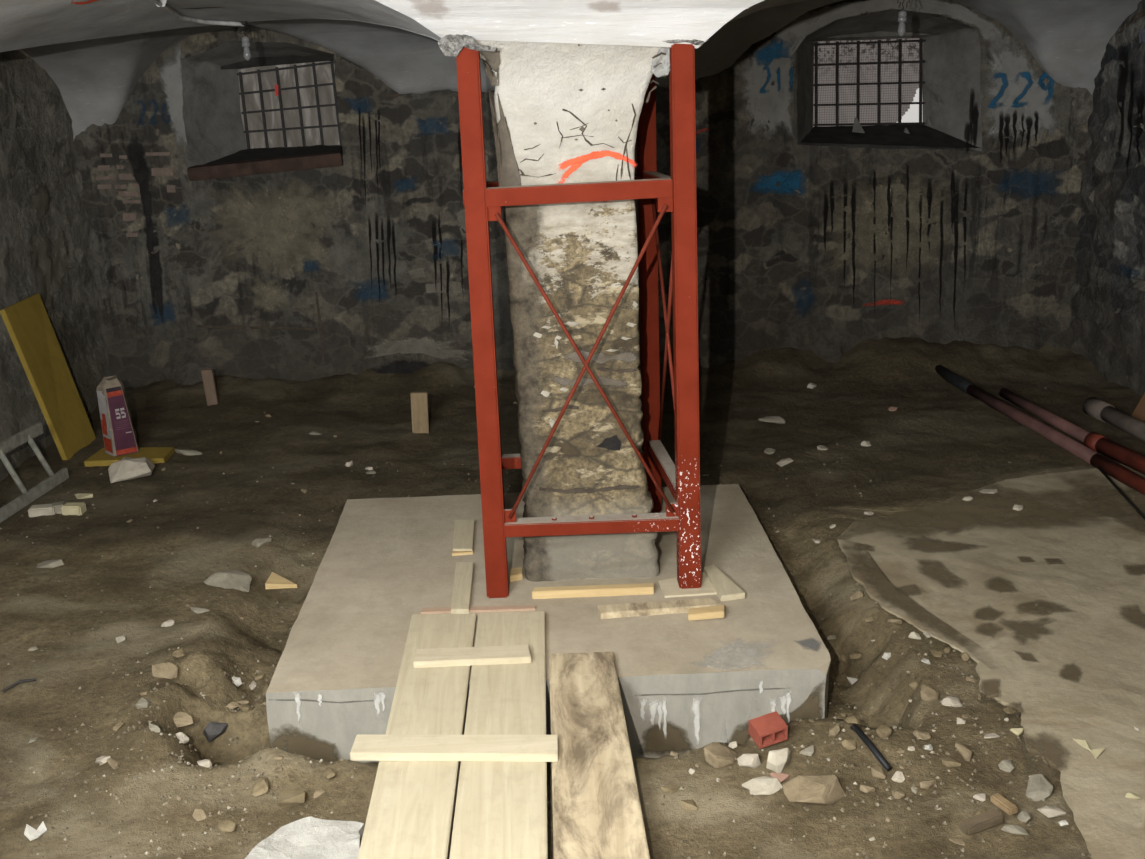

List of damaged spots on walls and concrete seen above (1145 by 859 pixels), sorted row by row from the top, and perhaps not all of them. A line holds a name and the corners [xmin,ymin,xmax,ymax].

flaking render [438,34,521,187]
crack [505,104,636,181]
water stain [999,112,1038,159]
water stain [128,140,163,318]
water stain [358,109,397,299]
water stain [432,216,463,322]
water stain [823,179,857,301]
water stain [873,167,968,325]
water stain [374,692,386,715]
water stain [639,699,701,755]
water stain [728,724,749,745]
water stain [759,681,823,723]